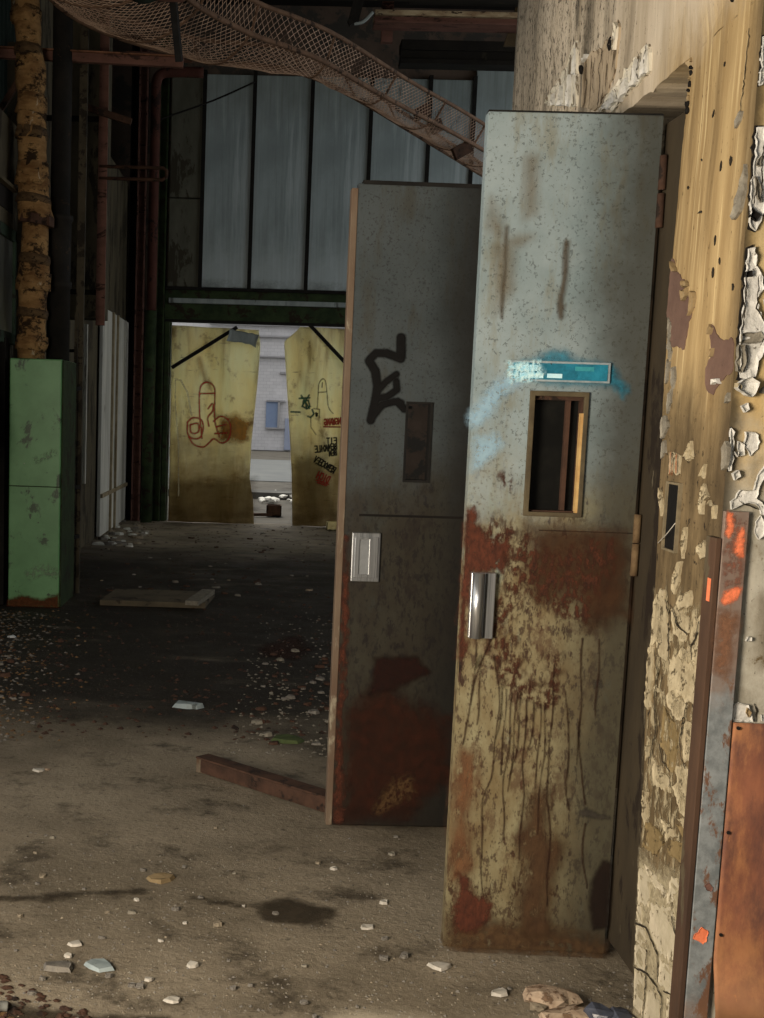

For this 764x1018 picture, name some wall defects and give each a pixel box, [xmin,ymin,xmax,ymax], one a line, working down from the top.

flaking render [544,20,652,112]
flaking render [719,125,764,232]
peeling [660,259,697,459]
flaking render [705,245,764,412]
peeling [682,441,718,519]
peeling [721,427,764,540]
rust [332,506,628,958]
peeling [732,702,764,722]
rust [713,722,764,1018]